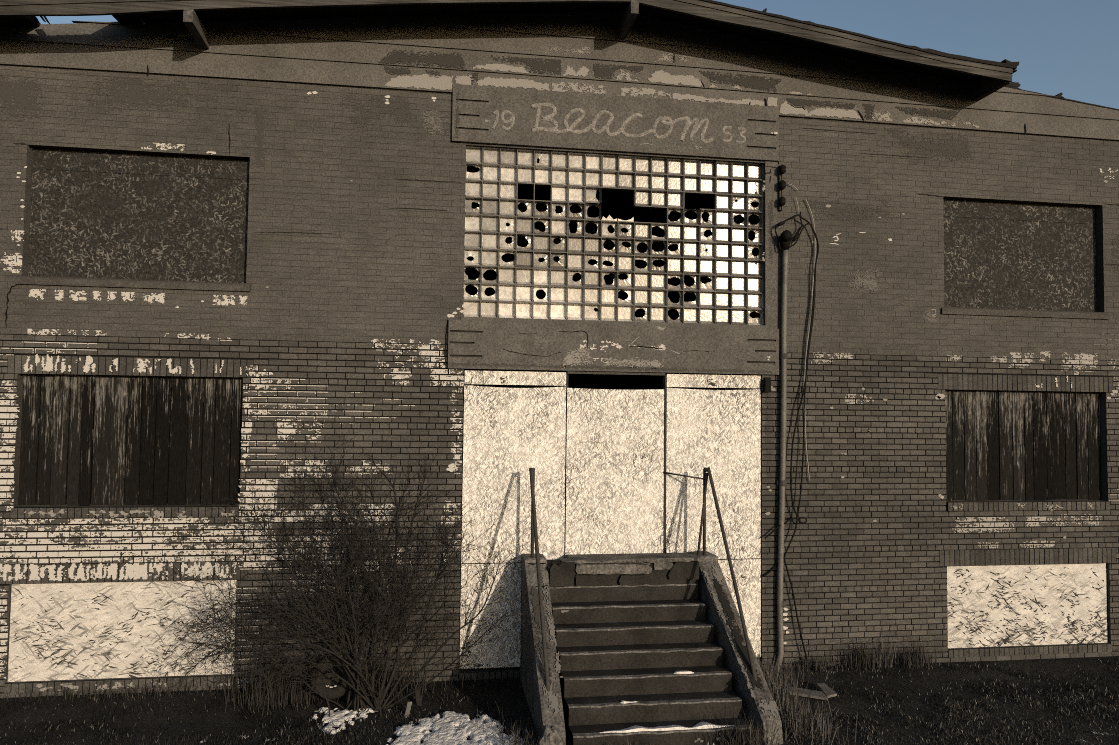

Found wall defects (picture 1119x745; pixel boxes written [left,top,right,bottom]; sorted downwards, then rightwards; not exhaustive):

peeling [385,47,979,128]
peeling [29,289,179,308]
peeling [201,295,247,305]
peeling [0,329,105,362]
peeling [811,352,853,364]
peeling [991,333,1119,399]
peeling [371,339,464,474]
peeling [0,366,415,596]
peeling [441,501,461,562]
peeling [953,514,1102,548]
peeling [0,589,8,679]